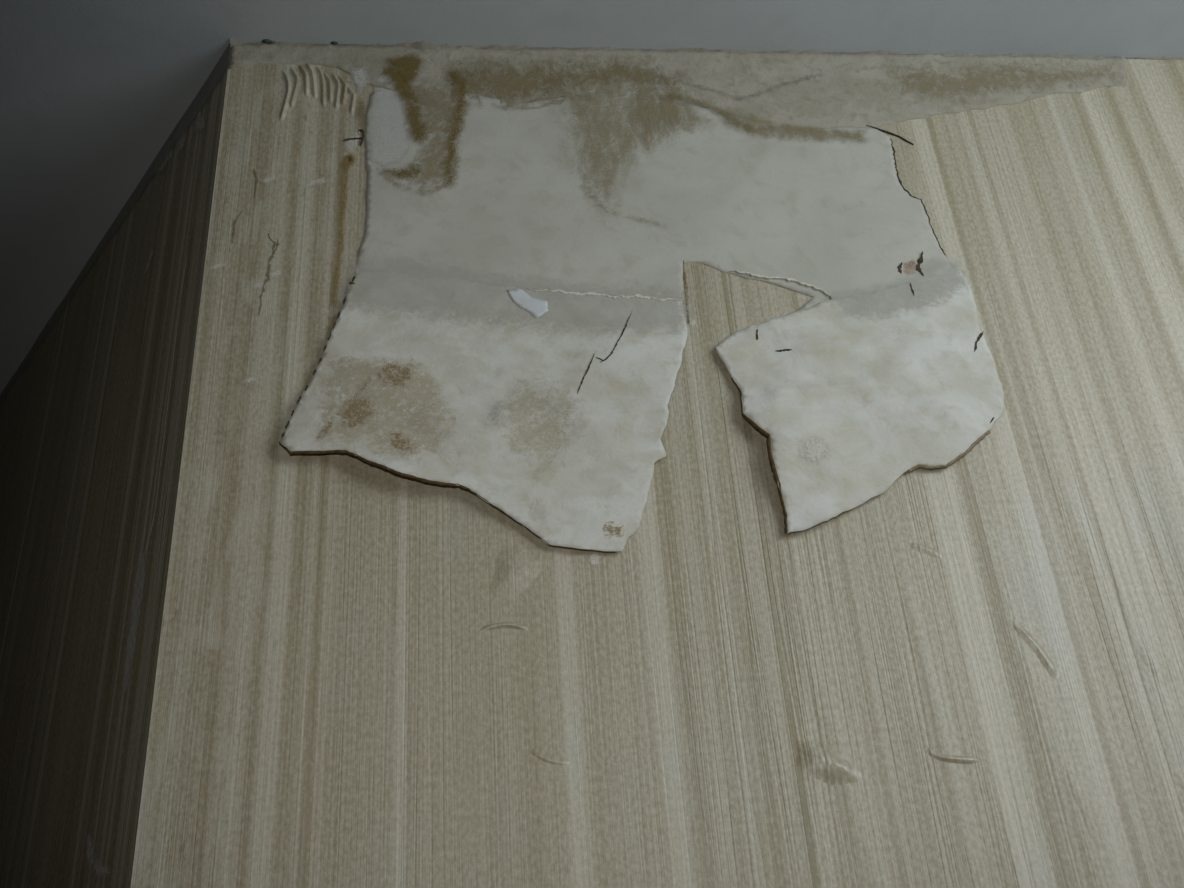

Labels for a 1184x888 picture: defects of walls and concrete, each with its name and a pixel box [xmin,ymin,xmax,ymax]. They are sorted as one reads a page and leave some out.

damp [376,51,870,226]
flaking render [228,43,1127,328]